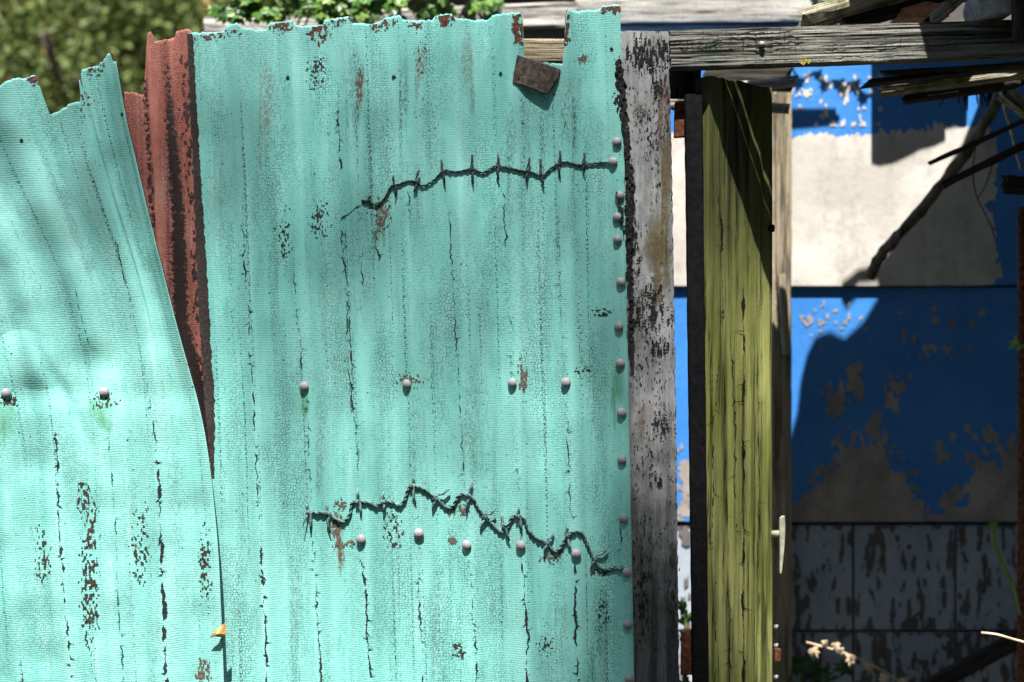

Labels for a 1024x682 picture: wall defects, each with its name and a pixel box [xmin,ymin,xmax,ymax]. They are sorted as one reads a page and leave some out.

peeling [631,132,687,359]
peeling [799,300,871,348]
peeling [820,361,865,419]
peeling [791,72,1003,331]
peeling [791,373,1017,682]